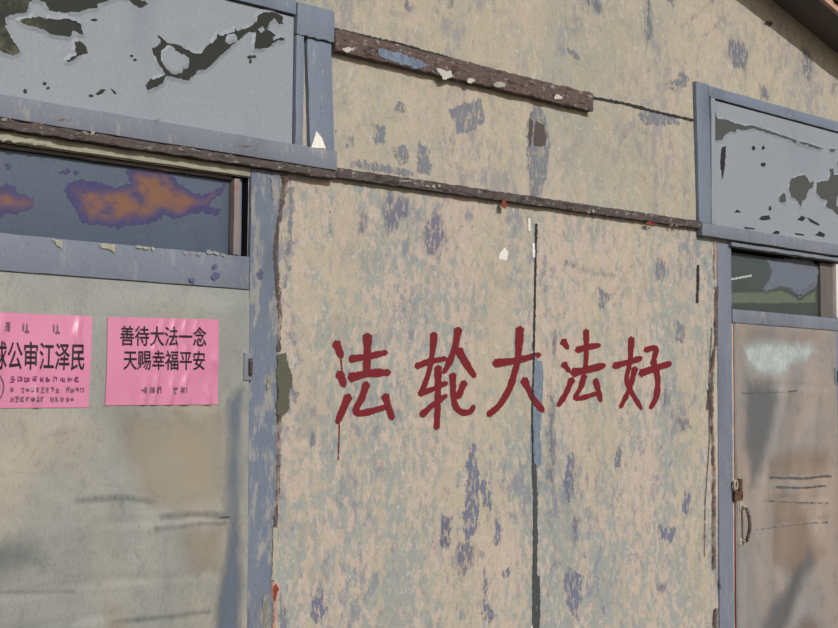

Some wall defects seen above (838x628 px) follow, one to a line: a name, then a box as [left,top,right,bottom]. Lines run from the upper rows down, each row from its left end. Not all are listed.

peeling [0,0,148,66]
peeling [146,9,287,93]
peeling [526,107,551,197]
peeling [715,110,838,237]
corrosion [271,526,279,628]